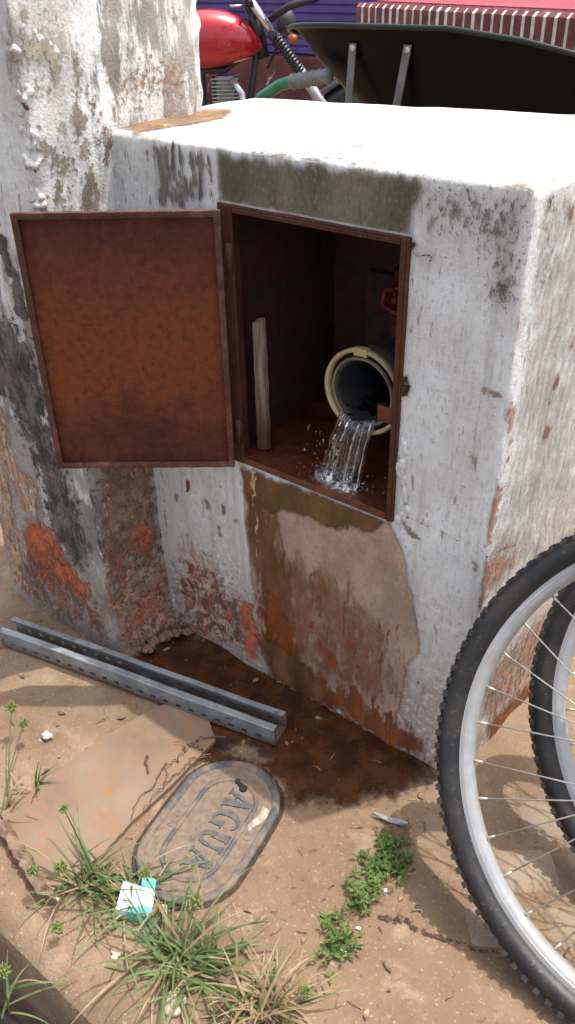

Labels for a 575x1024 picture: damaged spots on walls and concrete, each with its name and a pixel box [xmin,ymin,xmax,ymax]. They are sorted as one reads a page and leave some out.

peeling [17,3,113,211]
damp [146,139,565,314]
peeling [0,234,162,609]
spalling [487,479,505,545]
spalling [504,400,517,466]
rust [18,500,433,763]